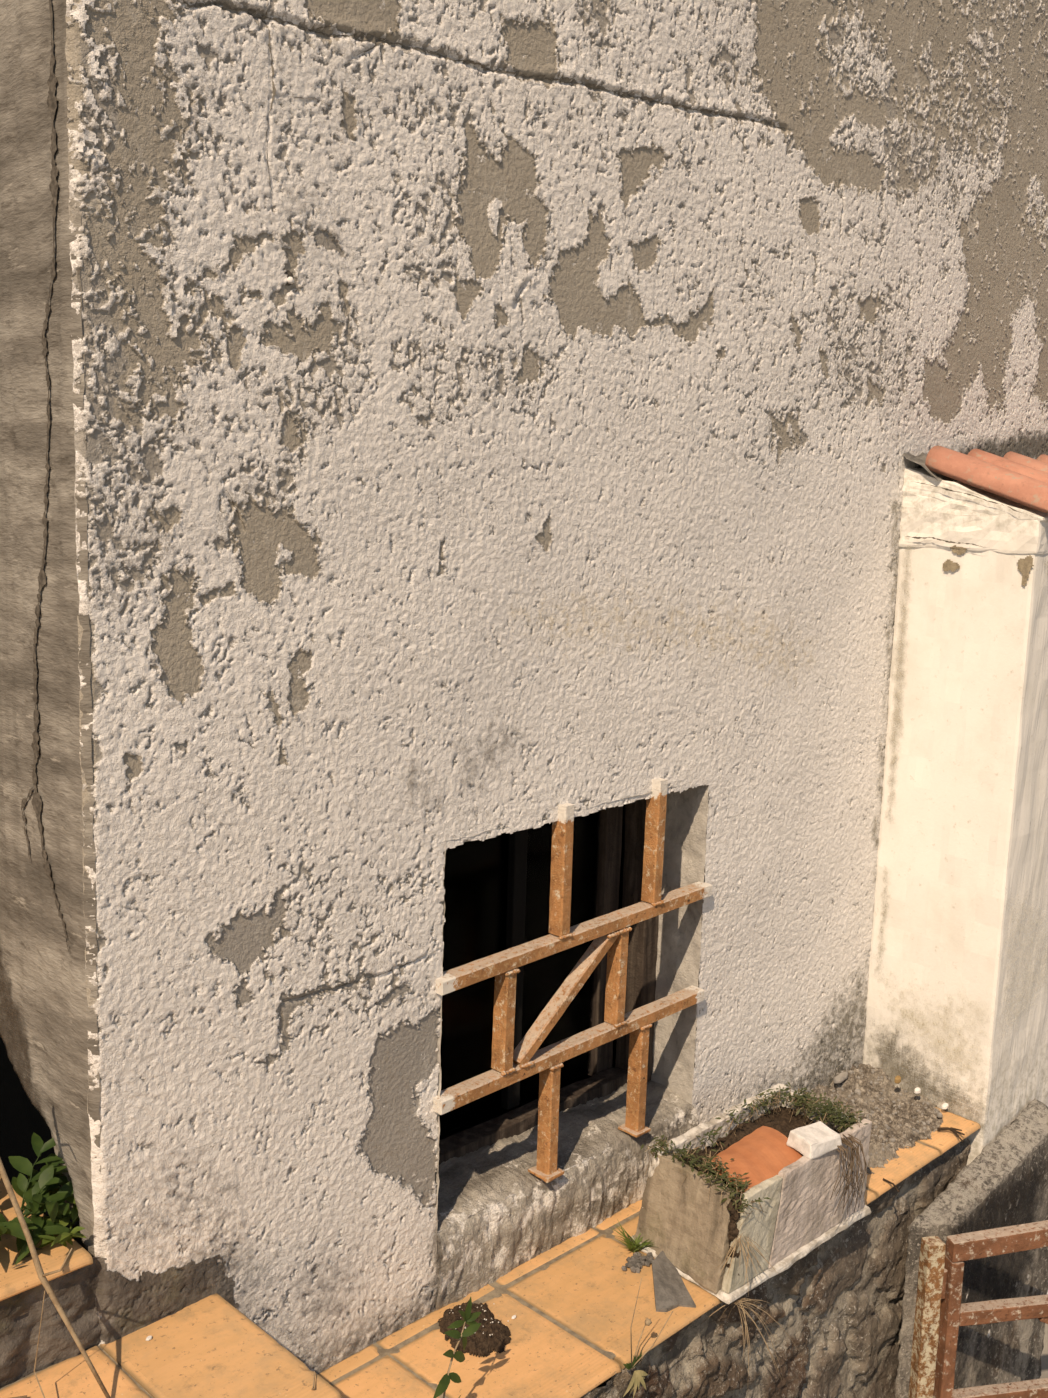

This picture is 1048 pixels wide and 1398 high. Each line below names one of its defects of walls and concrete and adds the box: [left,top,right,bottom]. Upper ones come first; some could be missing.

peeling [65,0,347,426]
crack [183,0,785,192]
peeling [451,121,713,341]
peeling [799,142,885,235]
peeling [858,291,882,323]
peeling [752,0,1048,178]
peeling [921,189,1048,423]
peeling [150,496,321,701]
peeling [204,890,287,1007]
peeling [260,973,409,1067]
peeling [357,1008,439,1207]
water stain [760,960,983,1127]